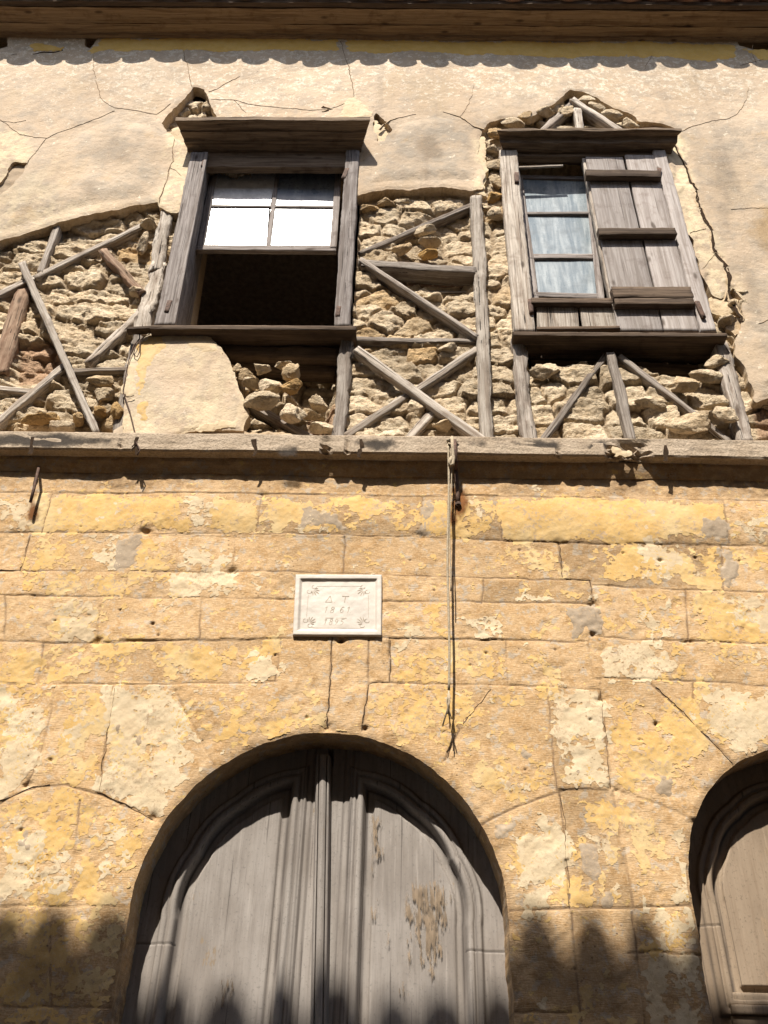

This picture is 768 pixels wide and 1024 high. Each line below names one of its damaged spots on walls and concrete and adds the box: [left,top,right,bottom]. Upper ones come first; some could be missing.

crack [1,56,171,165]
flaking render [0,209,176,433]
crack [158,139,176,203]
flaking render [167,100,213,143]
crack [184,41,354,112]
flaking render [181,95,640,437]
crack [444,87,484,130]
flaking render [527,290,768,458]
crack [675,45,768,324]
peeling [0,481,768,1024]